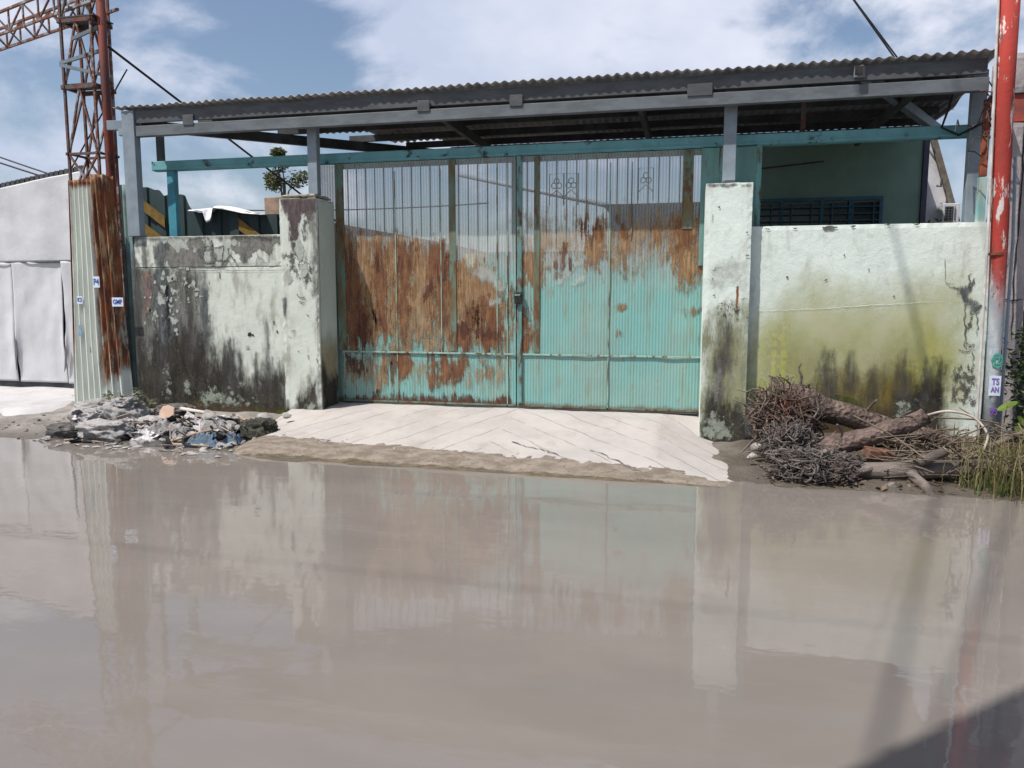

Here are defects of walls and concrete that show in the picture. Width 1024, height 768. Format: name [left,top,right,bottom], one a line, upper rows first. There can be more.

peeling [141,236,316,336]
water stain [131,237,339,414]
rust [342,201,703,404]
water stain [699,301,779,442]
water stain [817,355,945,429]